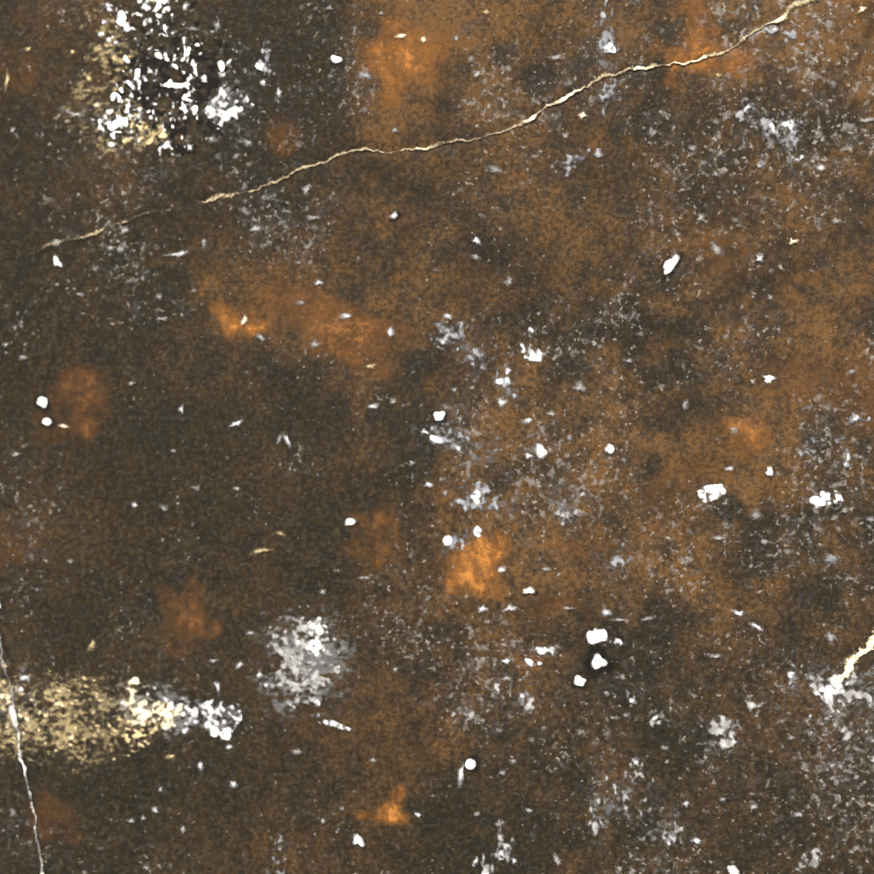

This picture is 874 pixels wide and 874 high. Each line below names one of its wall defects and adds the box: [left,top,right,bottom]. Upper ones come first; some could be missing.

spalling [74,0,254,155]
crack [202,0,814,203]
crack [42,213,144,250]
rust [221,310,264,334]
rust [448,535,504,594]
crack [833,631,874,685]
crack [0,635,45,874]